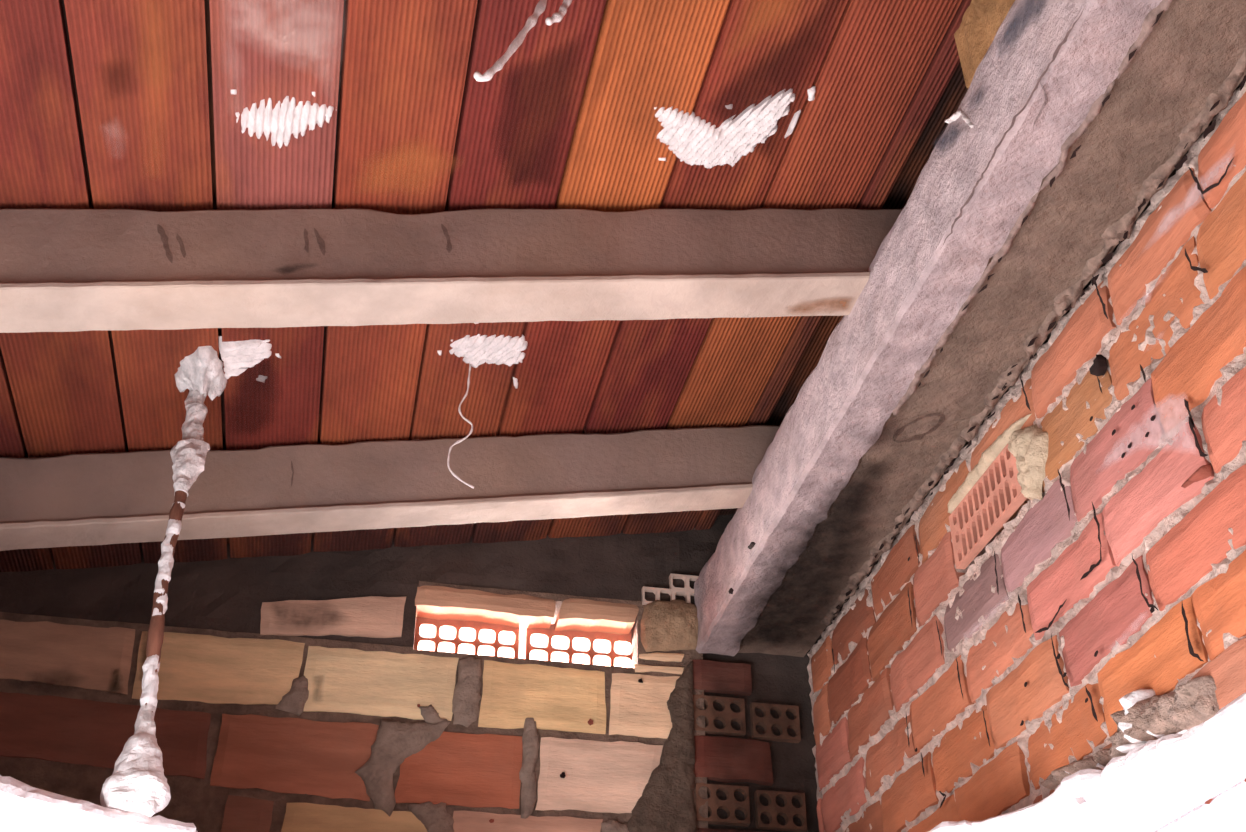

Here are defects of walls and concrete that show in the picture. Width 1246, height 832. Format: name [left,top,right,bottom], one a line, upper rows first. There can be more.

spalling [417,704,450,726]